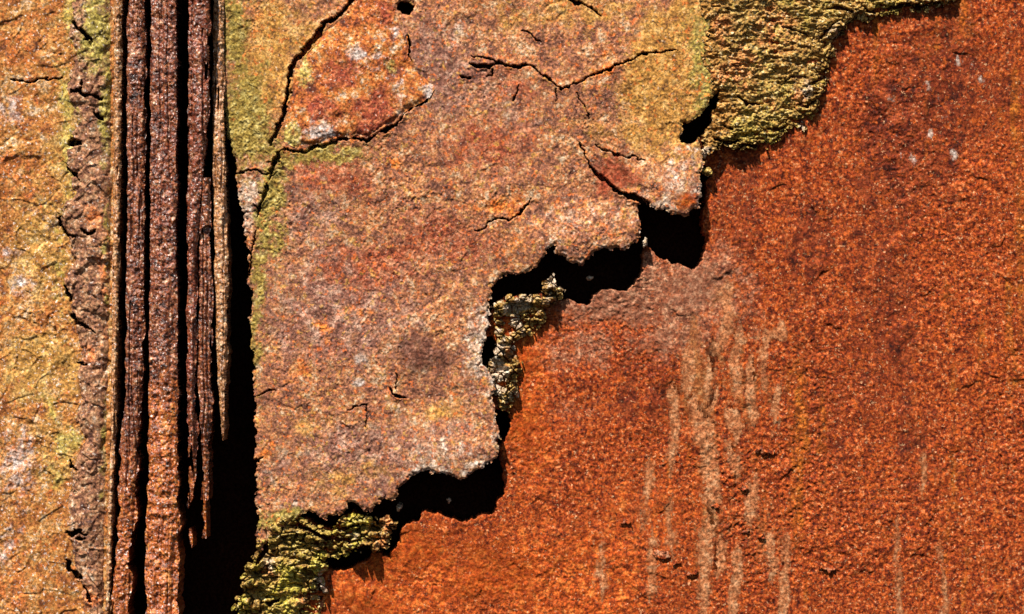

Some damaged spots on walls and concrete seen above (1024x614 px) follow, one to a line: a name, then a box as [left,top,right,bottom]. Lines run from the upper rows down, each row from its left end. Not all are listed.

crack [460,30,673,119]
crack [236,0,428,275]
crack [579,142,650,205]
rust [593,156,641,196]
peeling [61,0,113,614]
rust [509,401,538,450]
water stain [569,265,791,614]